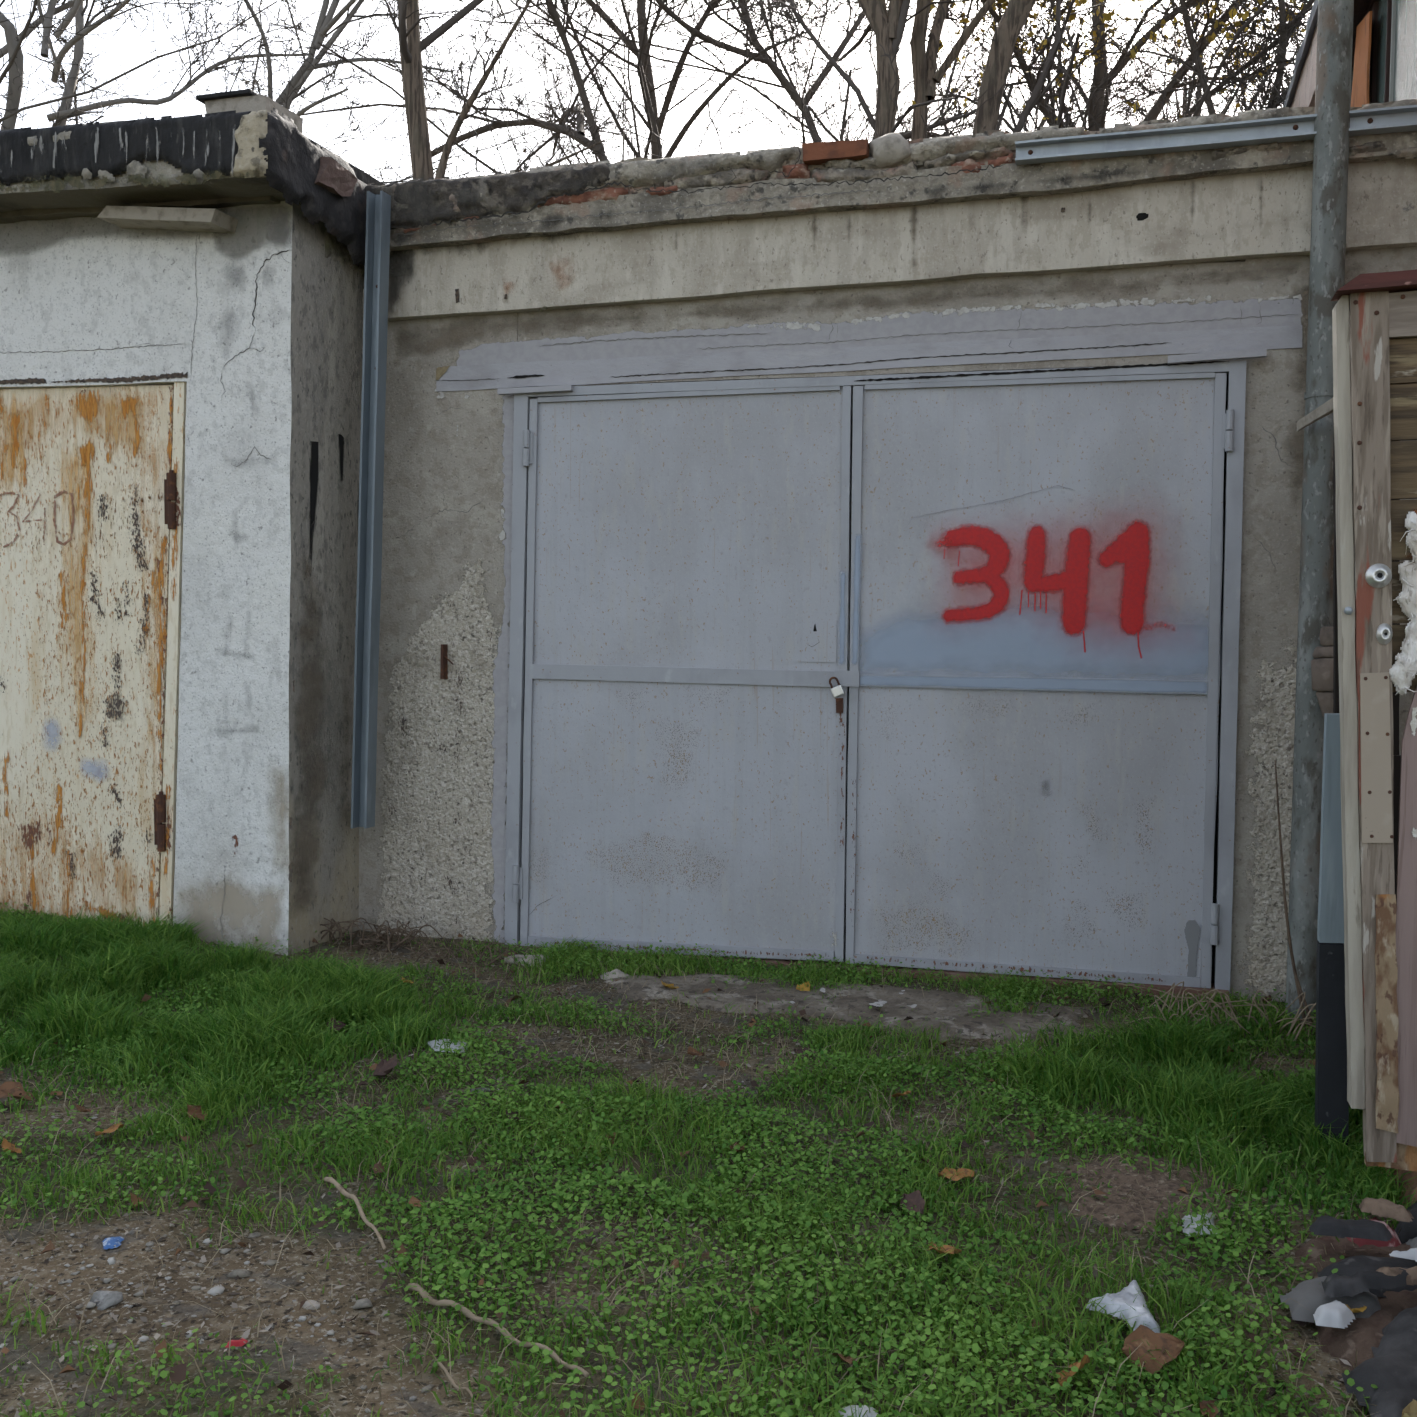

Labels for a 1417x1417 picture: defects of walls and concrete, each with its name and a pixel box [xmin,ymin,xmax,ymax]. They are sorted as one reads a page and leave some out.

spalling [230,110,268,178]
spalling [537,187,628,208]
spalling [646,146,1016,196]
crack [1,232,289,399]
corrosion [0,385,183,926]
spalling [373,555,502,942]